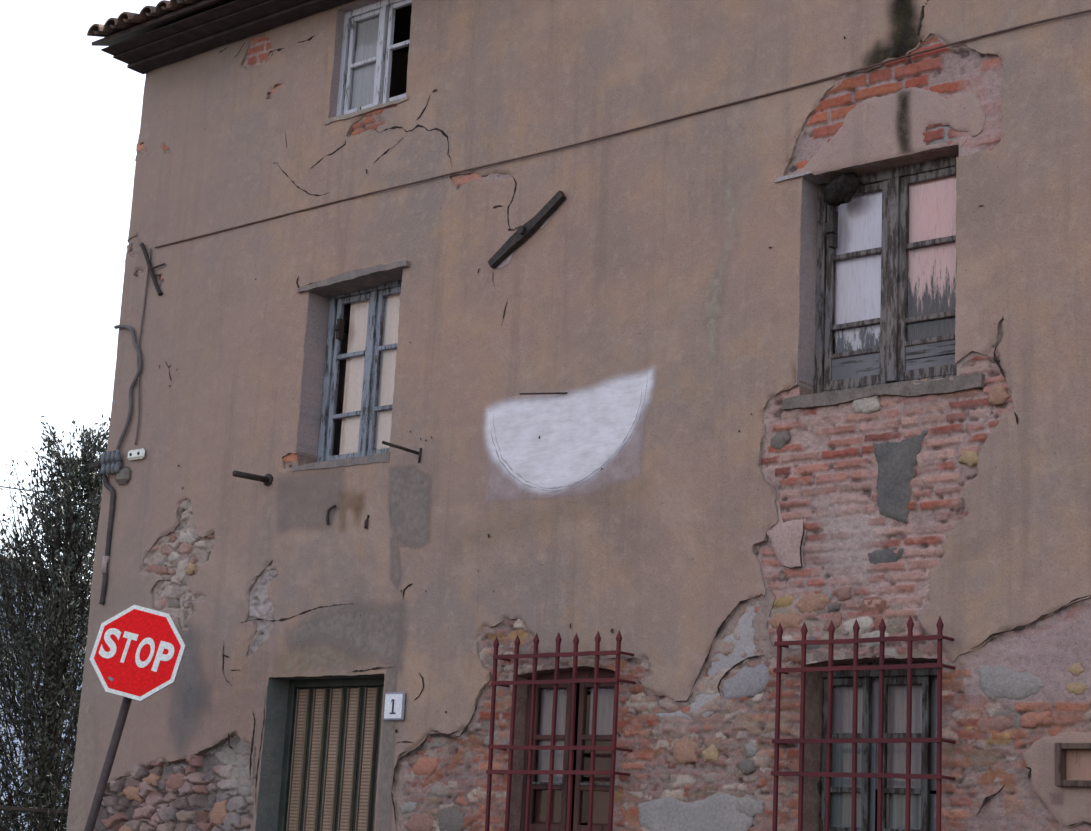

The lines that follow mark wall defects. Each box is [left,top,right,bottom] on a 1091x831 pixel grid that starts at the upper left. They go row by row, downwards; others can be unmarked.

spalling [243,35,273,70]
water stain [867,0,920,66]
crack [273,135,346,196]
crack [373,96,452,166]
spalling [787,34,1004,182]
water stain [898,93,908,151]
crack [493,177,517,231]
spalling [142,487,215,630]
spalling [247,563,278,656]
spalling [395,318,1091,831]
spalling [93,735,256,831]